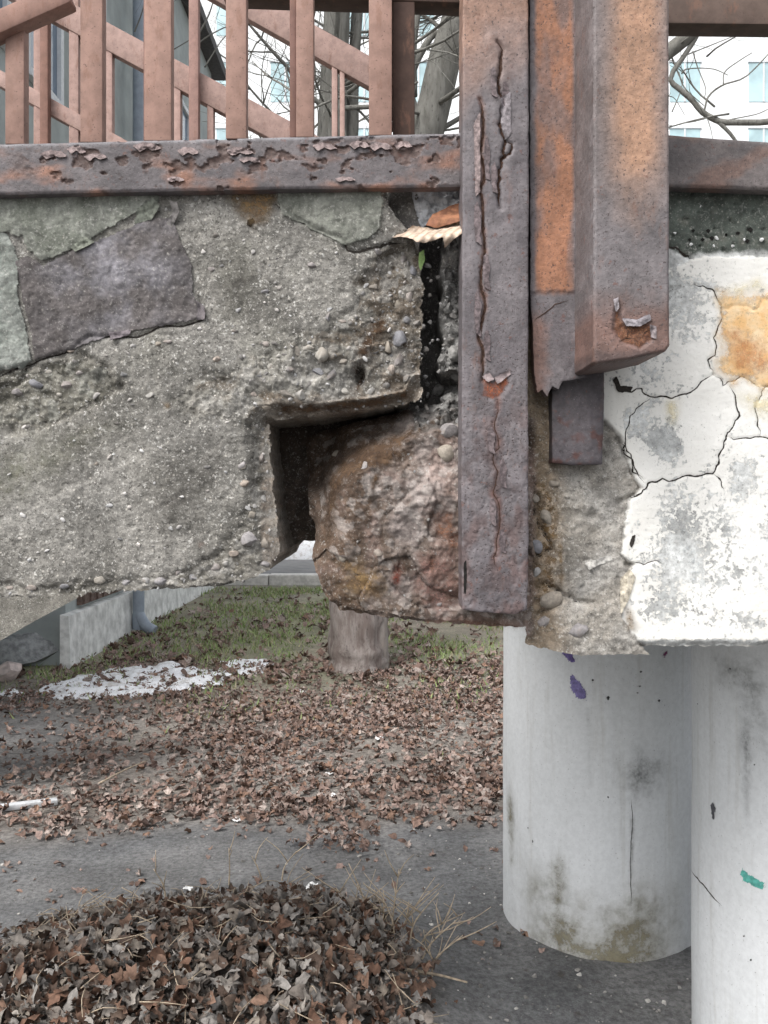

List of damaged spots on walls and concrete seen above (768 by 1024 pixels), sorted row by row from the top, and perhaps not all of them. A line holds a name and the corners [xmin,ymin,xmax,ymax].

peeling [40,145,107,161]
peeling [178,147,199,156]
peeling [227,147,260,163]
peeling [313,141,412,151]
crack [477,45,513,376]
rust [614,312,651,347]
peeling [613,297,657,339]
rust [718,293,768,389]
rust [484,377,507,398]
crack [619,285,768,502]
spalling [0,241,650,656]
crack [627,803,635,898]